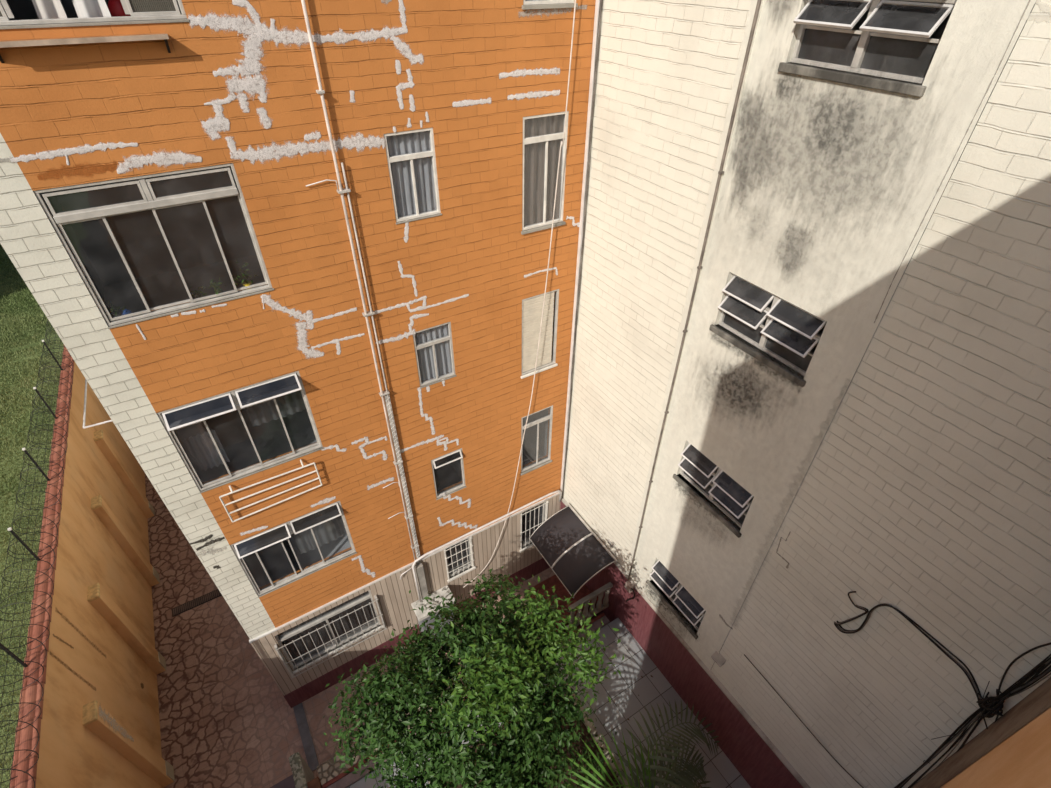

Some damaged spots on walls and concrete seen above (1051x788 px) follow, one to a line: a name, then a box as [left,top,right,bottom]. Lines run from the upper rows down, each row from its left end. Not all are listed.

crack [10,0,429,174]
crack [452,67,560,107]
crack [260,220,469,358]
crack [322,379,459,490]
crack [311,496,336,508]
crack [437,493,477,529]